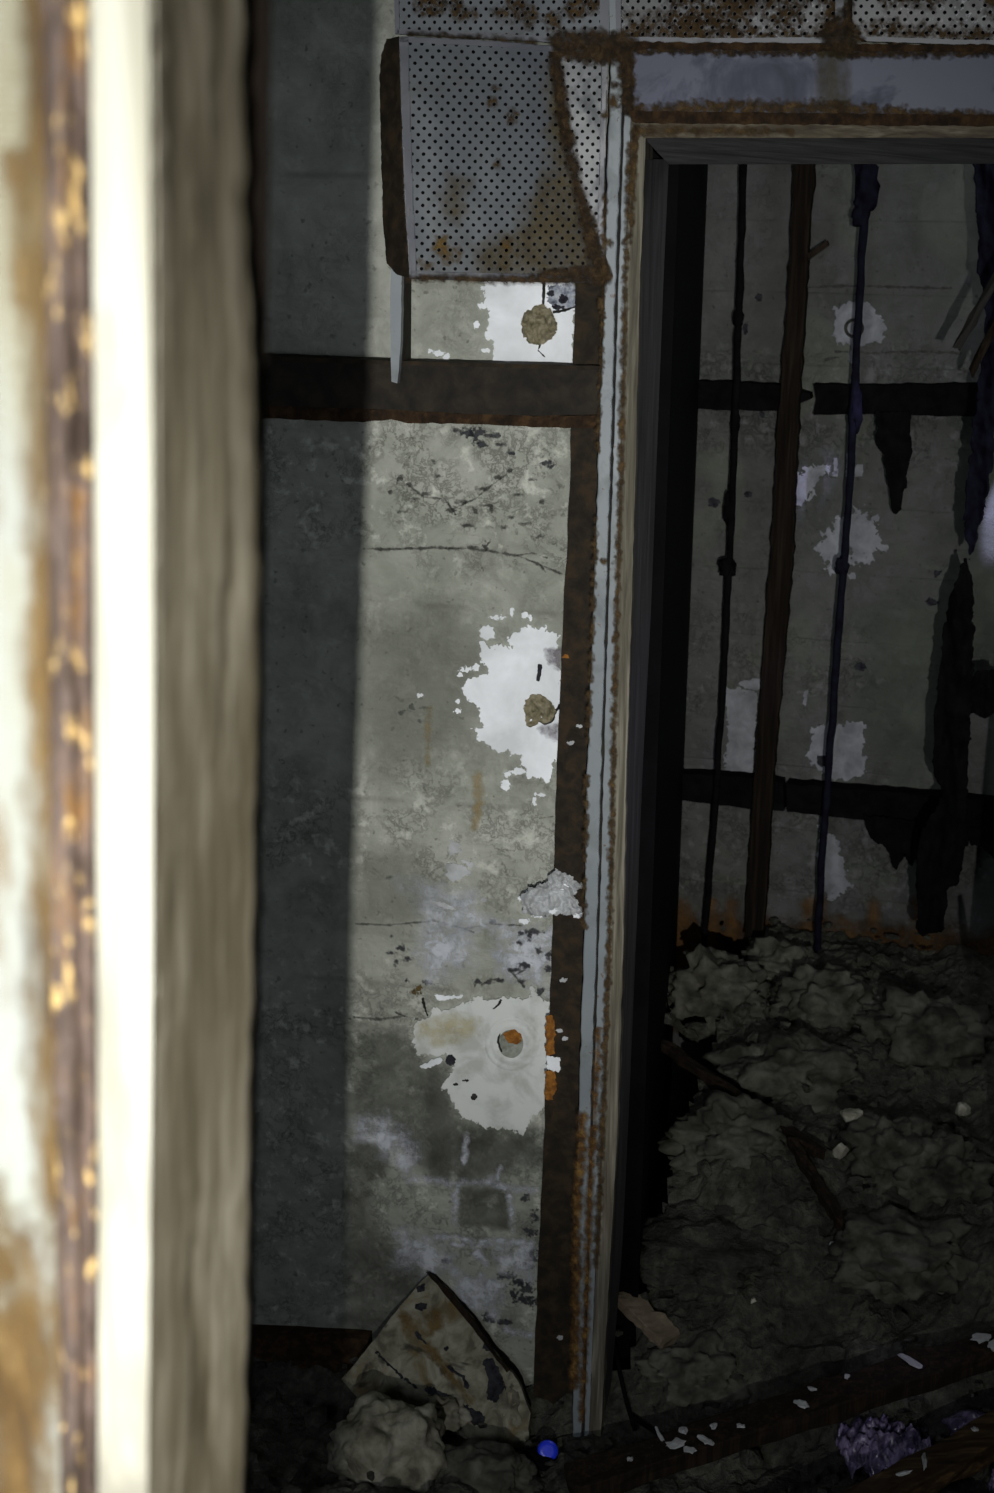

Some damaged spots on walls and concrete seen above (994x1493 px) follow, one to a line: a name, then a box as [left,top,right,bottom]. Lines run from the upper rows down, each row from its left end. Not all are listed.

corrosion [3,0,48,368]
spalling [546,283,575,310]
corrosion [29,396,44,501]
peeling [479,608,532,640]
peeling [457,663,480,677]
corrosion [399,0,994,1422]
corrosion [27,543,60,1217]
peeling [420,1057,443,1069]
peeling [546,1056,561,1072]